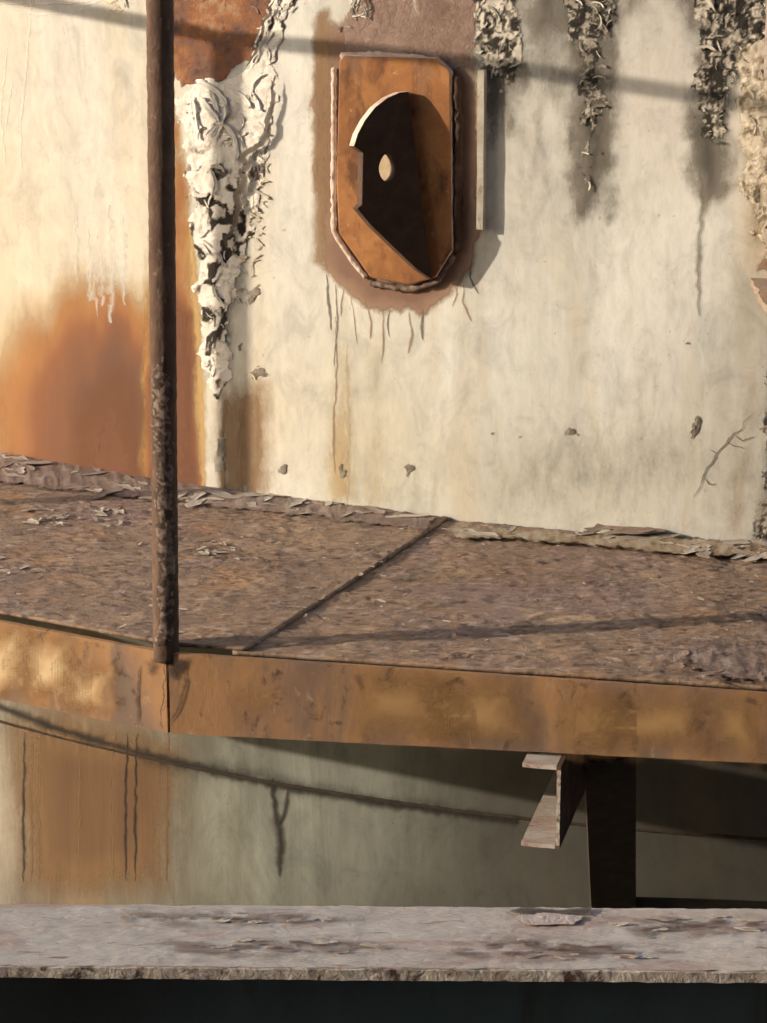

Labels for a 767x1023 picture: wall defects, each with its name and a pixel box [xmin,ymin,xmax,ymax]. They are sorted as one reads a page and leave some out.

corrosion [0,280,152,478]
corrosion [174,119,206,486]
peeling [173,0,295,399]
peeling [0,356,767,646]
peeling [338,0,618,217]
peeling [681,0,767,316]
crack [694,416,754,496]
corrosion [0,630,110,708]
spalling [655,629,767,683]